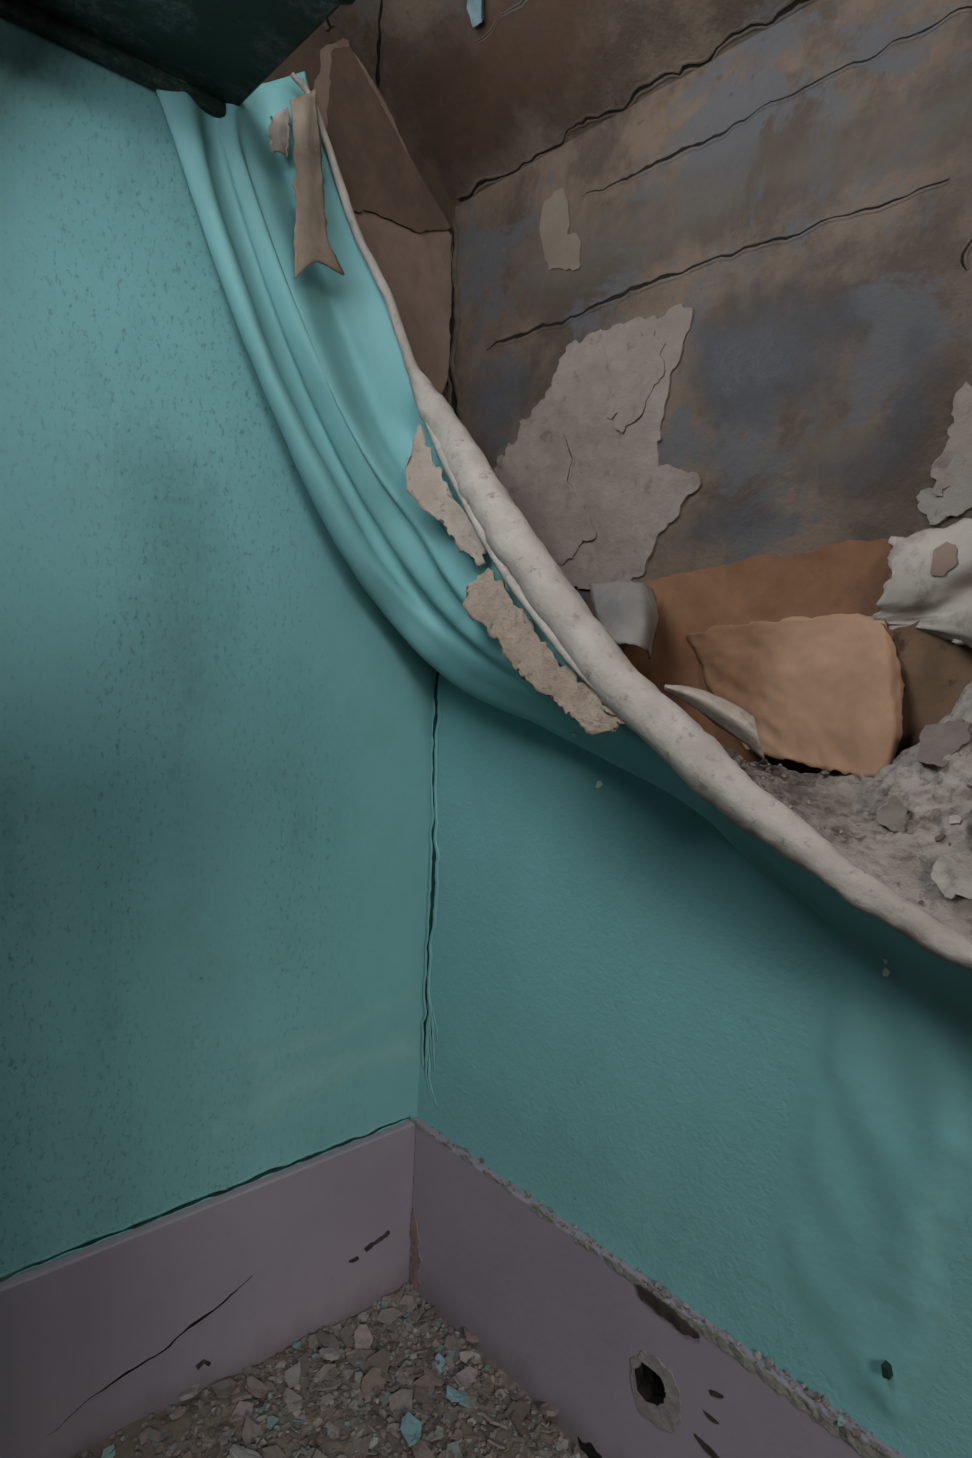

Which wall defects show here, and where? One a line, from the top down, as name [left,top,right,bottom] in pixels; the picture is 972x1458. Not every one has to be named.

crack [372,0,386,91]
peeling [466,0,484,27]
crack [447,0,972,431]
flaking render [494,304,703,590]
flaking render [917,382,972,525]
crack [421,670,443,1108]
crack [47,1274,254,1437]
spalling [409,1116,898,1458]